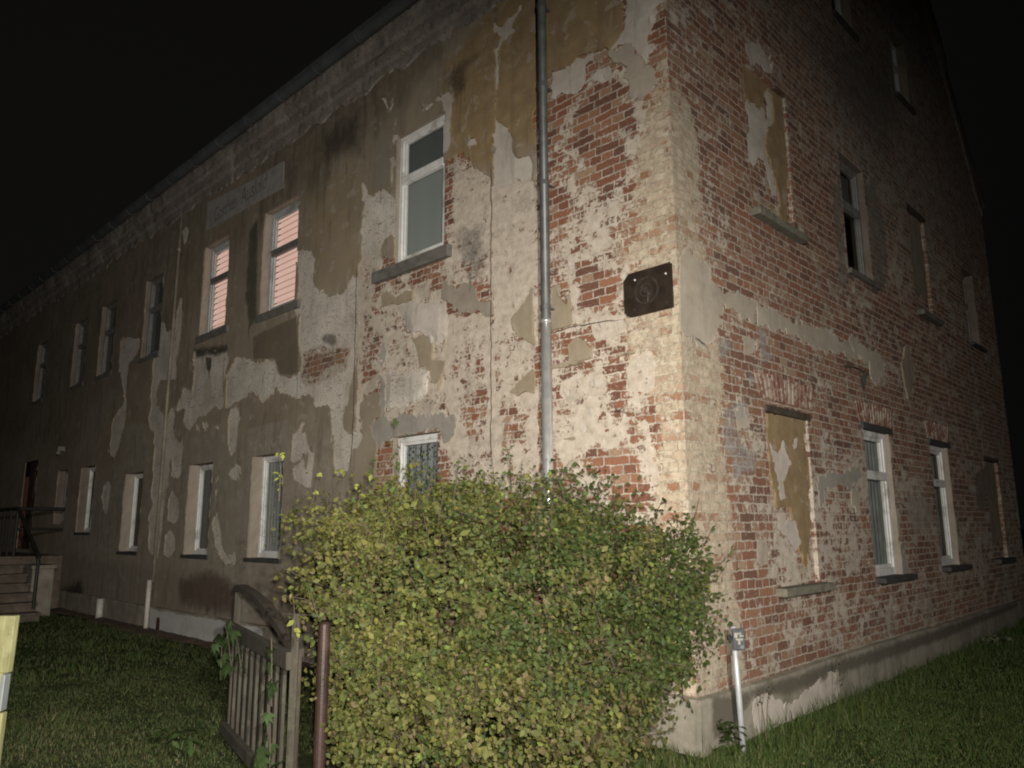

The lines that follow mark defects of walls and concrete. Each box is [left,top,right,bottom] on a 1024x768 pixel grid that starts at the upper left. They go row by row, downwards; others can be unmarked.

flaking render [611,0,661,65]
flaking render [490,120,533,189]
flaking render [551,52,644,212]
flaking render [745,90,776,196]
flaking render [555,249,630,340]
flaking render [111,337,140,458]
flaking render [149,156,397,558]
flaking render [435,305,540,499]
flaking render [559,373,659,526]
flaking render [626,351,656,393]
flaking render [770,438,798,500]
flaking render [752,669,840,735]